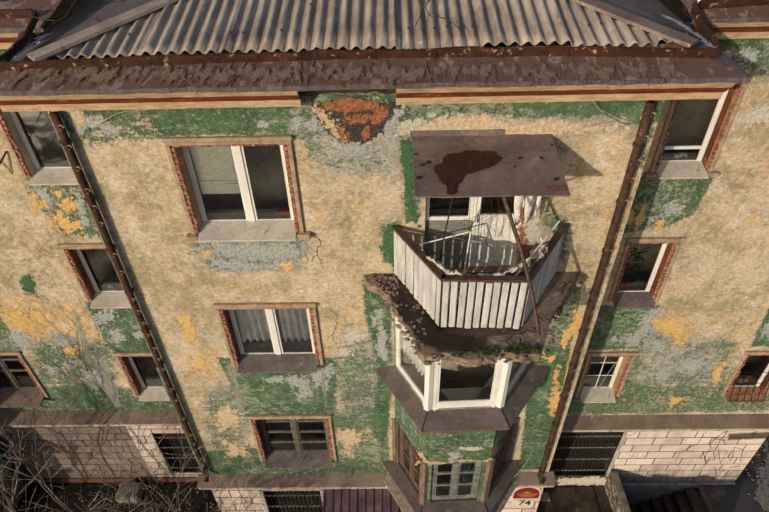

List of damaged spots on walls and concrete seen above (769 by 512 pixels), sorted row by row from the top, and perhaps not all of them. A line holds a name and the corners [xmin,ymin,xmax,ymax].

peeling [724,44,766,67]
flaking render [289,97,631,228]
corrosion [420,150,506,195]
peeling [24,187,98,238]
peeling [0,304,106,394]
peeling [91,308,144,347]
peeling [259,297,531,403]
peeling [610,305,728,387]
peeling [209,404,252,459]
peeling [334,425,368,459]